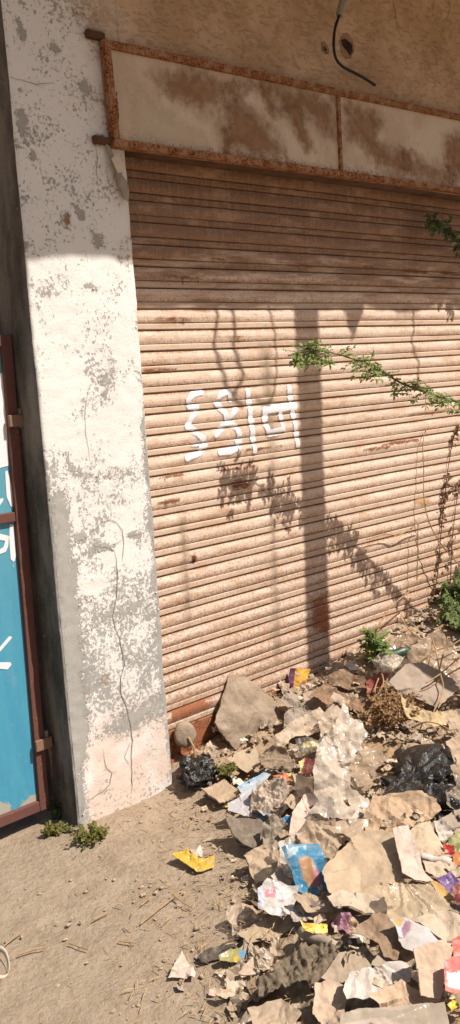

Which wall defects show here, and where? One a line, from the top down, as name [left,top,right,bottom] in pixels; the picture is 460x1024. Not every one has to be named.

peeling [15,16,27,41]
peeling [14,108,39,160]
peeling [73,203,106,252]
peeling [93,348,118,405]
peeling [49,408,167,823]
rust [312,594,330,632]
crack [86,504,139,801]
rust [171,699,220,744]